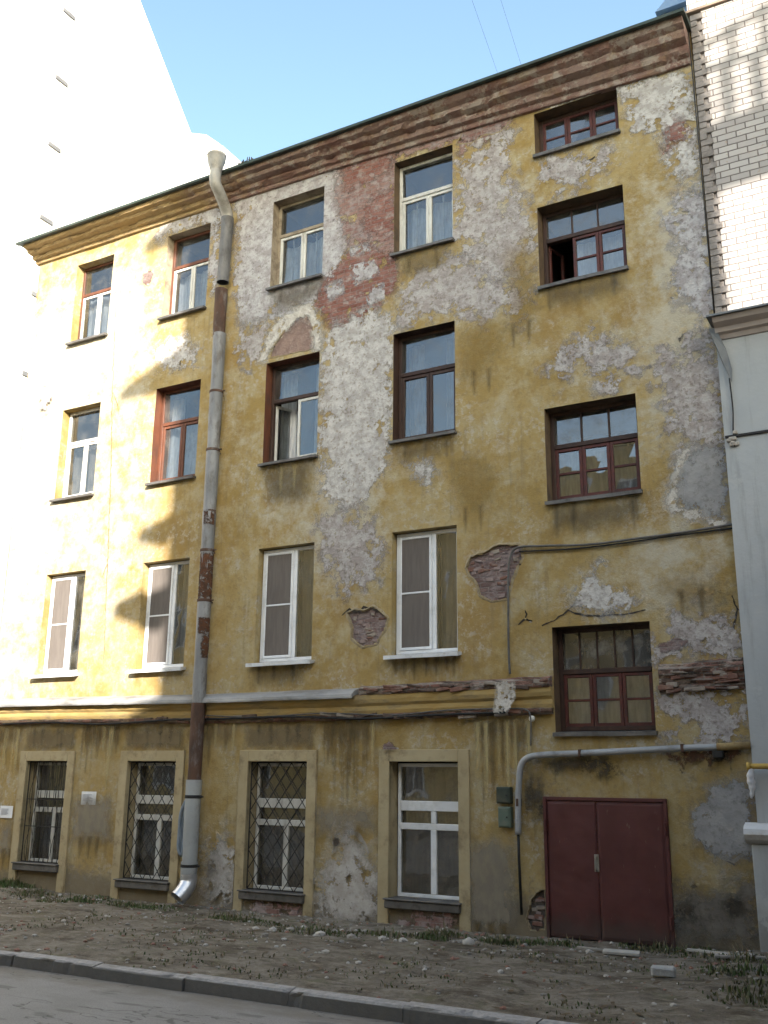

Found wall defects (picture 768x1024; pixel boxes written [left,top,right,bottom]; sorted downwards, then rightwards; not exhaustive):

peeling [537,144,613,204]
peeling [616,72,713,318]
peeling [233,118,538,649]
rust [203,509,216,525]
flaking render [665,444,729,529]
rust [198,553,214,599]
rust [198,617,210,658]
crack [518,603,646,626]
flaking render [359,675,552,719]
flaking render [650,594,748,753]
damp [476,721,530,785]
peeling [691,778,756,866]